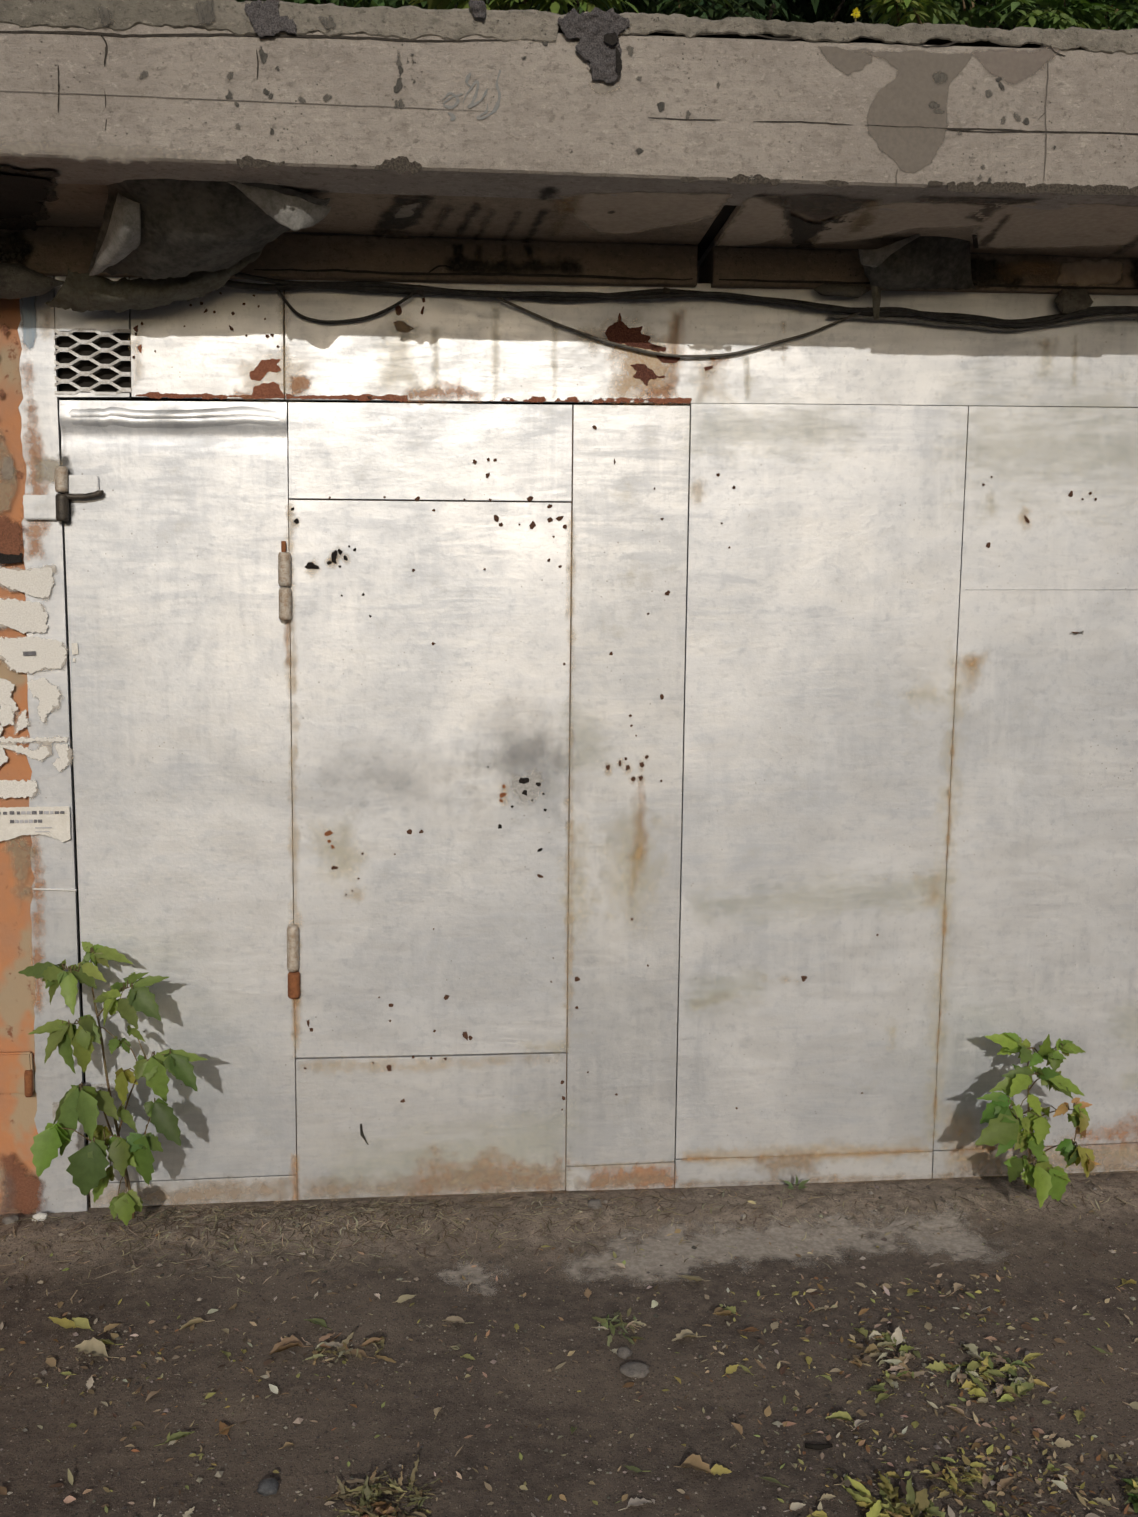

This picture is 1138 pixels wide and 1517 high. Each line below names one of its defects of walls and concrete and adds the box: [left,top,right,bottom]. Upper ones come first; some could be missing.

corrosion [394,297,425,333]
corrosion [136,313,692,404]
corrosion [583,1166,675,1188]